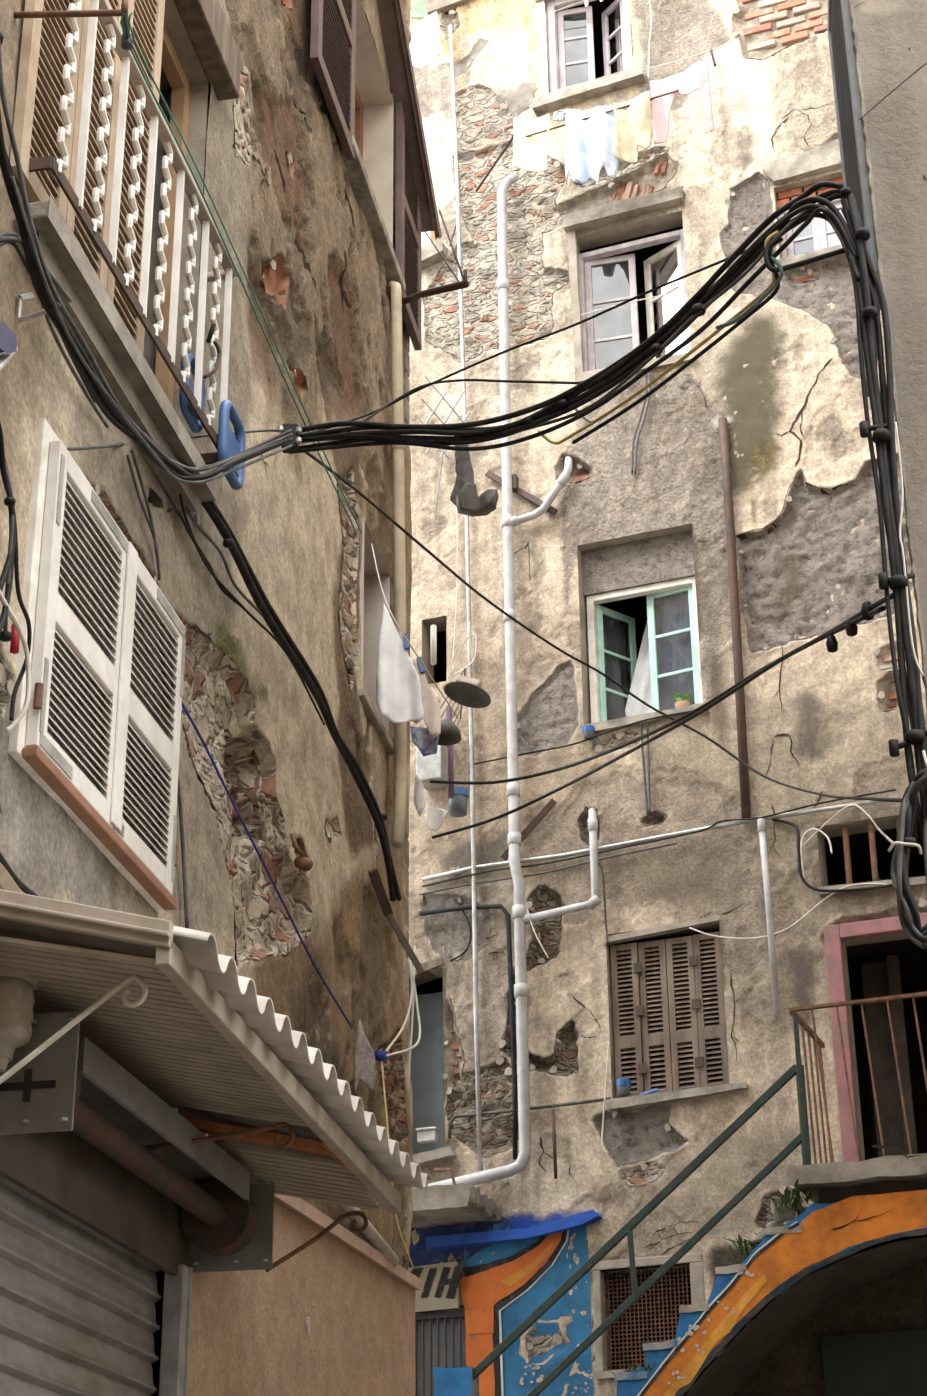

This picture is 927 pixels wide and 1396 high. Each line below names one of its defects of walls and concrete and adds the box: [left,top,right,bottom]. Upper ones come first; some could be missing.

flaking render [732,0,828,60]
flaking render [719,172,861,378]
damp [714,316,786,516]
crack [736,358,848,540]
flaking render [736,454,913,652]
spalling [223,737,263,843]
flaking render [292,837,308,873]
flaking render [592,1104,688,1167]
flaking render [520,1324,568,1385]